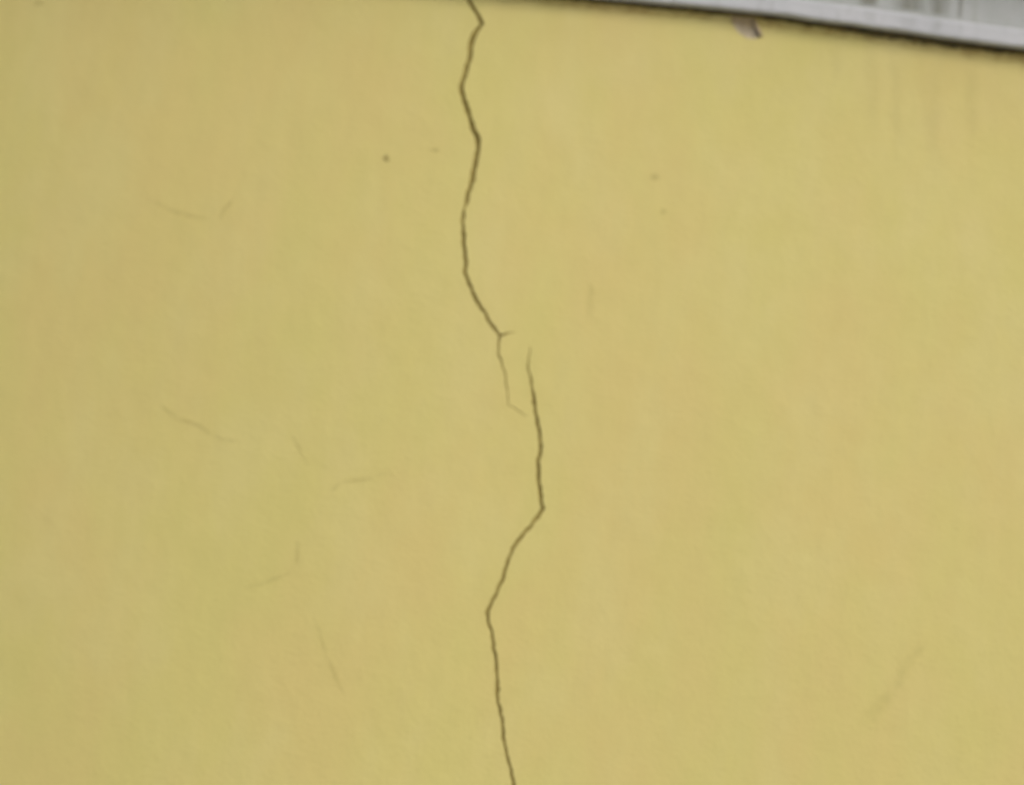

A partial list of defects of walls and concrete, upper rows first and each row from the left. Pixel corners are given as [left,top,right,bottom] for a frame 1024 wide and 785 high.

crack [459,0,545,785]